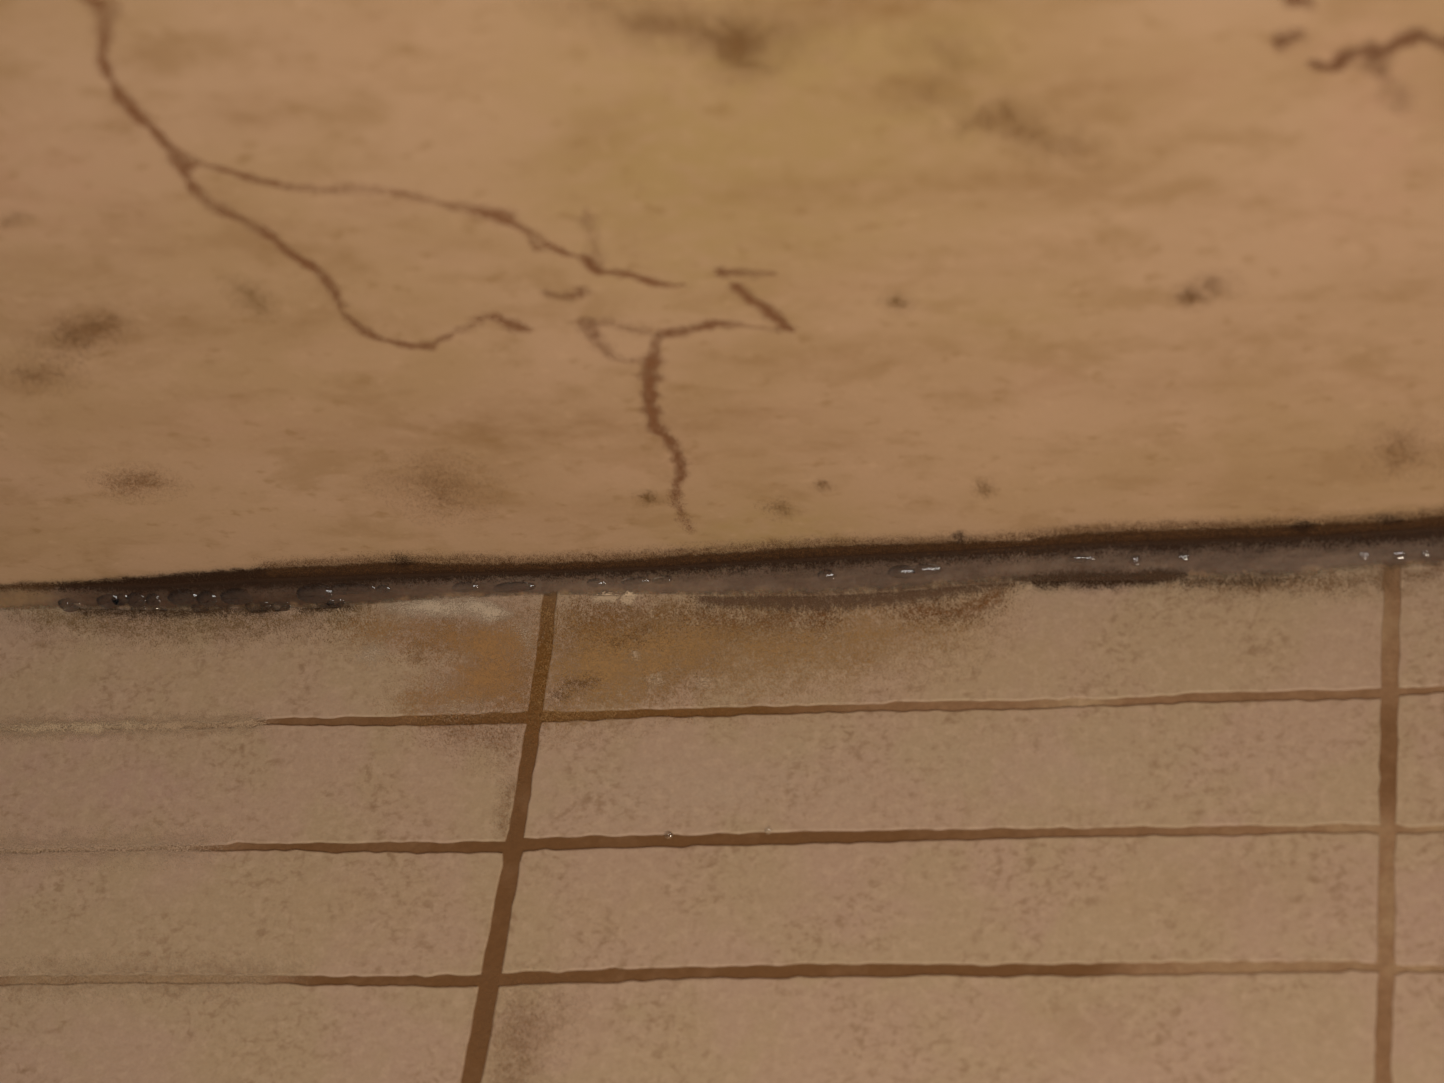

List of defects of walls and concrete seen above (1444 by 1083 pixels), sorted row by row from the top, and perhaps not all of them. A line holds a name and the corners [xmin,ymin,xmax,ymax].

crack [1268,0,1444,114]
crack [81,0,797,533]
damp [0,506,1444,650]